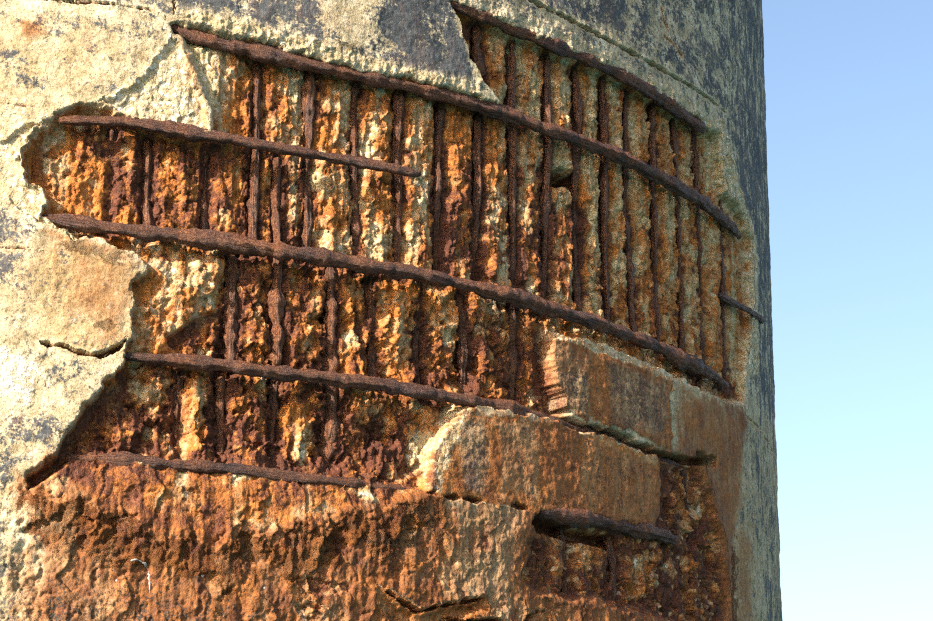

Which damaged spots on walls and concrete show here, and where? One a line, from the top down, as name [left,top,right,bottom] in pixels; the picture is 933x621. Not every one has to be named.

peeling [0,340,49,416]
crack [38,336,129,359]
rust [38,222,145,363]
rust [0,449,644,621]
spalling [0,0,653,247]
spalling [26,223,759,621]
spalling [309,90,605,318]
crack [376,583,550,621]
spalling [450,0,759,377]
rust [673,379,757,621]